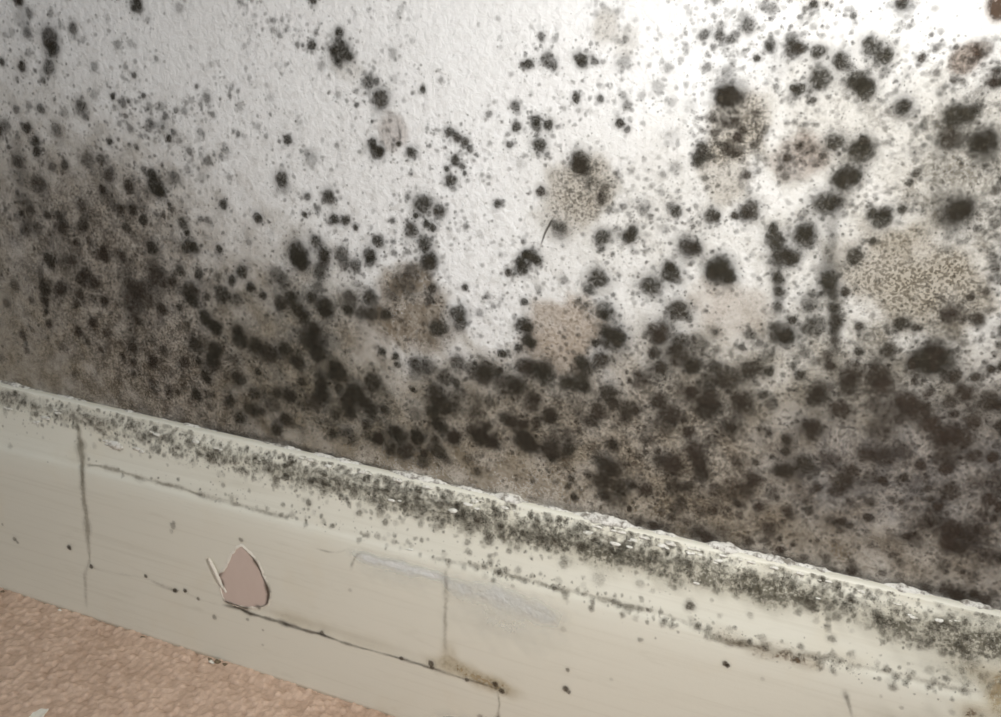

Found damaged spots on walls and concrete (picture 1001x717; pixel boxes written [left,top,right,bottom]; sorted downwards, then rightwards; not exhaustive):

leakage [41,28,59,82]
leakage [331,27,353,63]
leakage [520,53,557,70]
leakage [574,53,598,66]
leakage [785,35,875,103]
leakage [862,36,894,65]
leakage [363,75,388,109]
leakage [715,85,739,106]
leakage [0,99,1001,610]
peeling [207,544,272,610]
crack [233,606,330,638]
leakage [872,612,1001,661]